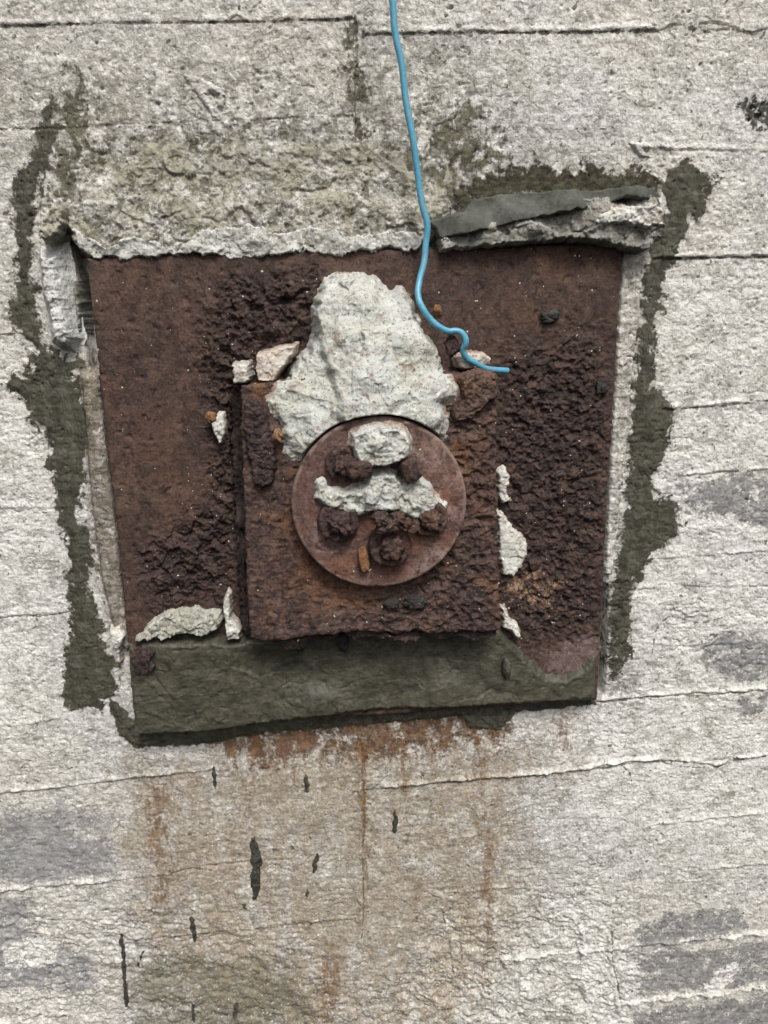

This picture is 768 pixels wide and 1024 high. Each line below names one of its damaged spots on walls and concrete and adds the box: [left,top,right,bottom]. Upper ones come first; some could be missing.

crack [0,13,768,142]
spalling [72,194,666,261]
corrosion [432,304,442,318]
corrosion [443,335,461,358]
spalling [265,271,460,519]
corrosion [205,395,251,637]
corrosion [502,566,568,610]
corrosion [271,630,497,652]
corrosion [205,717,514,837]
corrosion [145,791,179,864]
crack [134,756,766,941]
crack [610,931,622,1006]